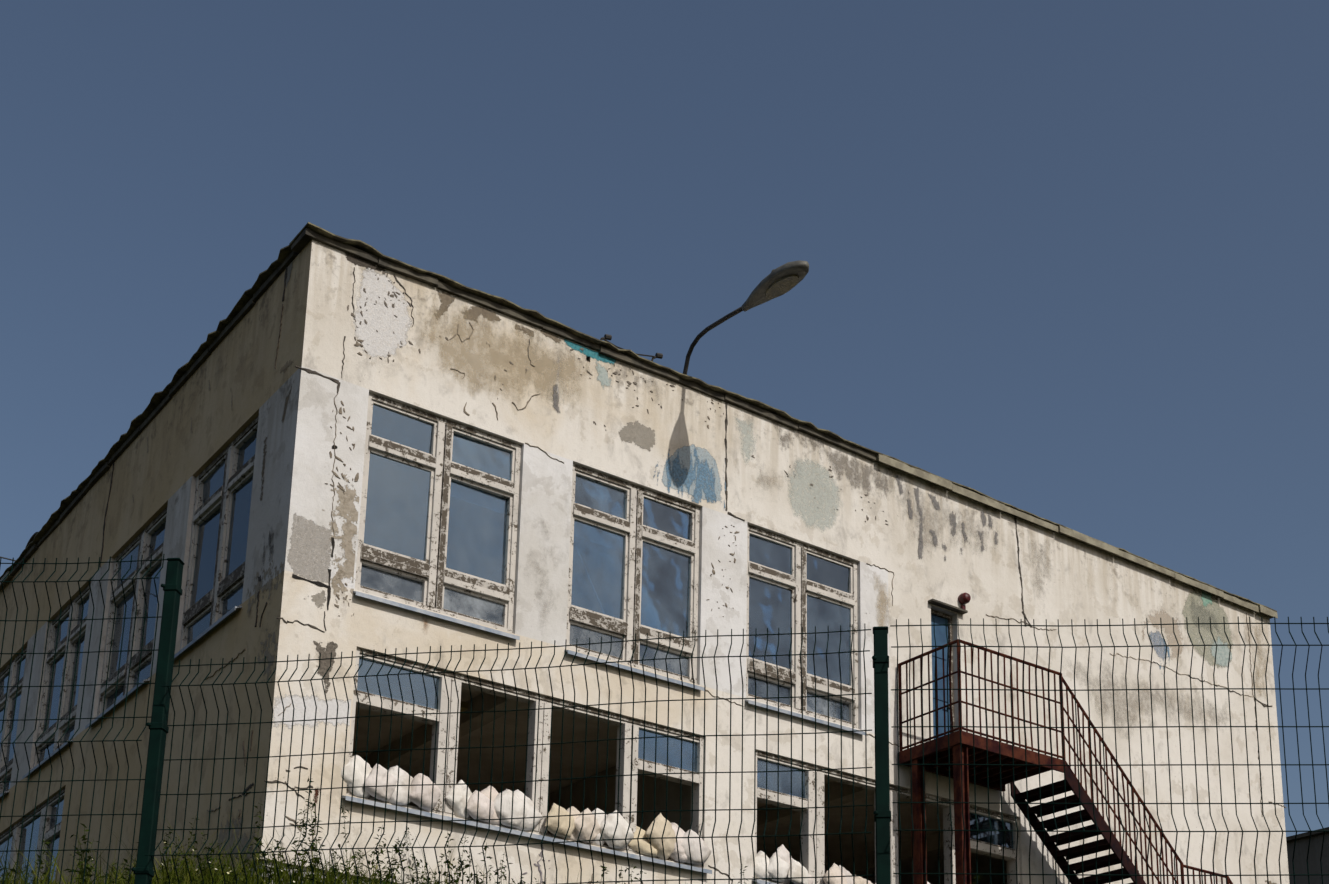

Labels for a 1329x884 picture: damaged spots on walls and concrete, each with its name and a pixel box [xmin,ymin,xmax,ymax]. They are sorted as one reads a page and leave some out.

spalling [345,253,421,363]
crack [394,275,414,327]
spalling [434,290,683,452]
crack [205,266,356,680]
spalling [242,401,359,689]
water stain [773,423,998,560]
crack [986,517,1057,631]
crack [1110,613,1286,817]